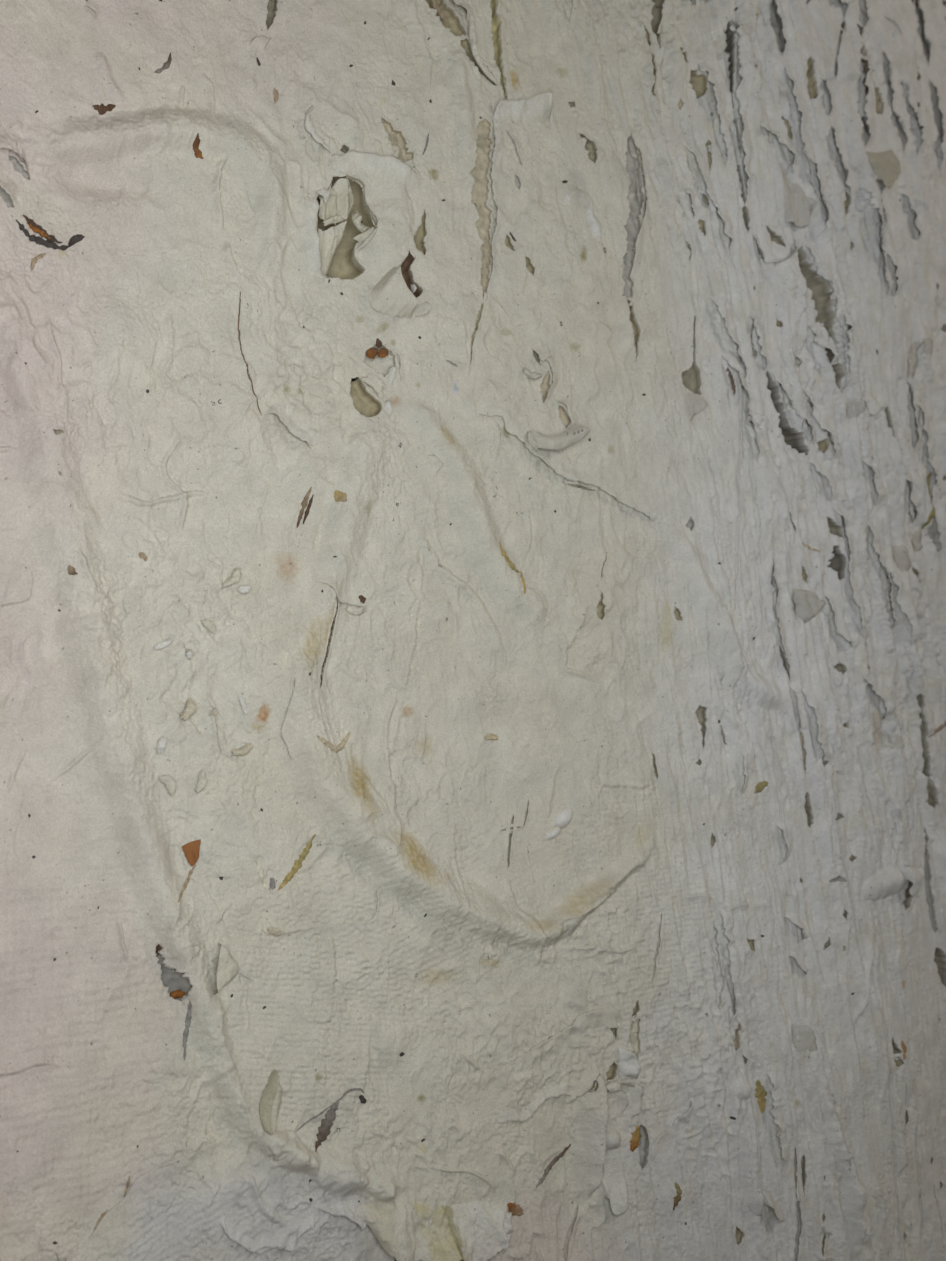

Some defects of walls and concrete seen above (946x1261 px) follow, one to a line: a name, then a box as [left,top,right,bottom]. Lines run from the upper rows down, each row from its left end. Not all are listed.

spalling [313,116,427,319]
peeling [698,0,833,264]
peeling [831,0,922,296]
peeling [915,0,946,173]
hole [347,343,400,419]
peeling [523,346,590,451]
peeling [710,291,772,463]
peeling [845,323,946,452]
peeling [884,474,926,643]
peeling [768,553,852,767]
peeling [896,866,925,911]
peeling [333,1195,513,1261]